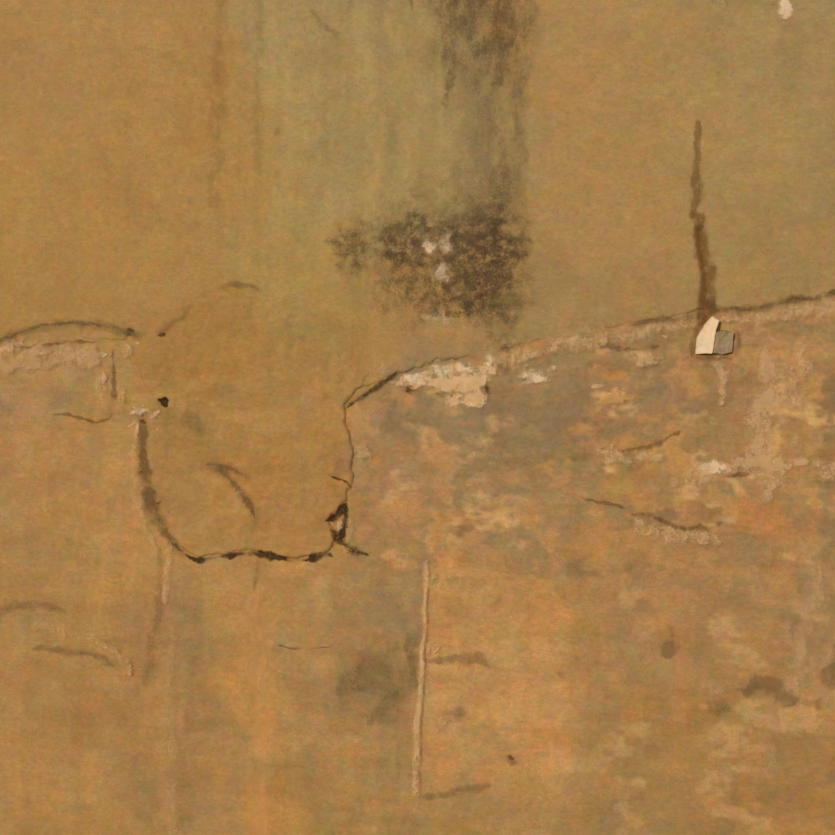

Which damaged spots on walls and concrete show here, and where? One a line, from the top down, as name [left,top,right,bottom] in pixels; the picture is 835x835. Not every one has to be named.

corrosion [778,0,793,19]
damp [423,242,450,253]
crack [348,371,397,407]
crack [171,476,369,563]
peeling [0,291,835,835]